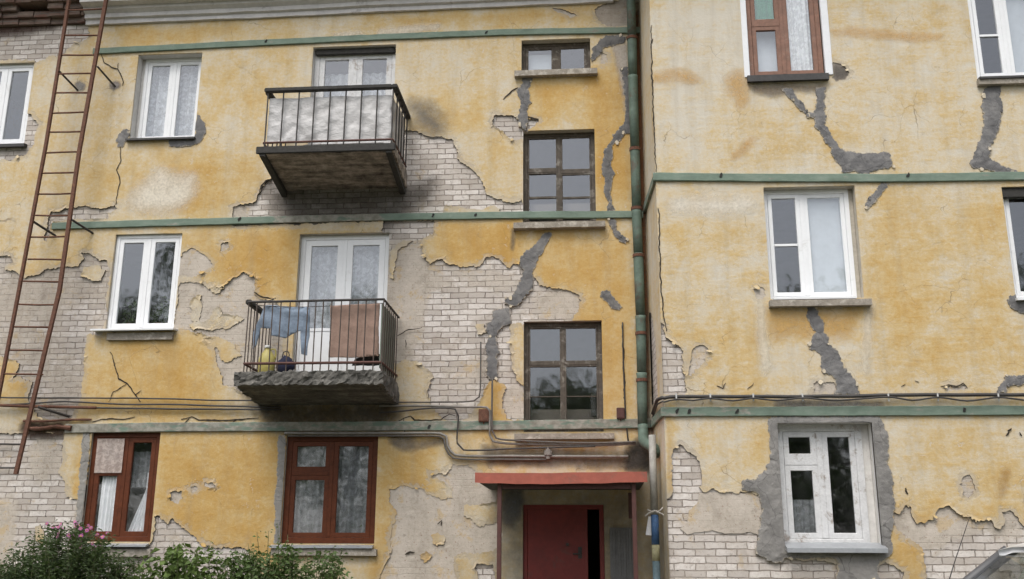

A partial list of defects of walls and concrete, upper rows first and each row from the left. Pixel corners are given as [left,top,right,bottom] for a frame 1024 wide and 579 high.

crack [503,78,538,132]
crack [590,25,657,244]
crack [782,86,895,210]
crack [969,86,1018,172]
flaking render [0,253,111,577]
flaking render [174,248,284,392]
flaking render [233,129,581,429]
crack [485,232,552,381]
crack [806,307,860,394]
flaking render [379,464,503,579]
flaking render [667,444,837,579]
flaking render [893,505,1024,579]